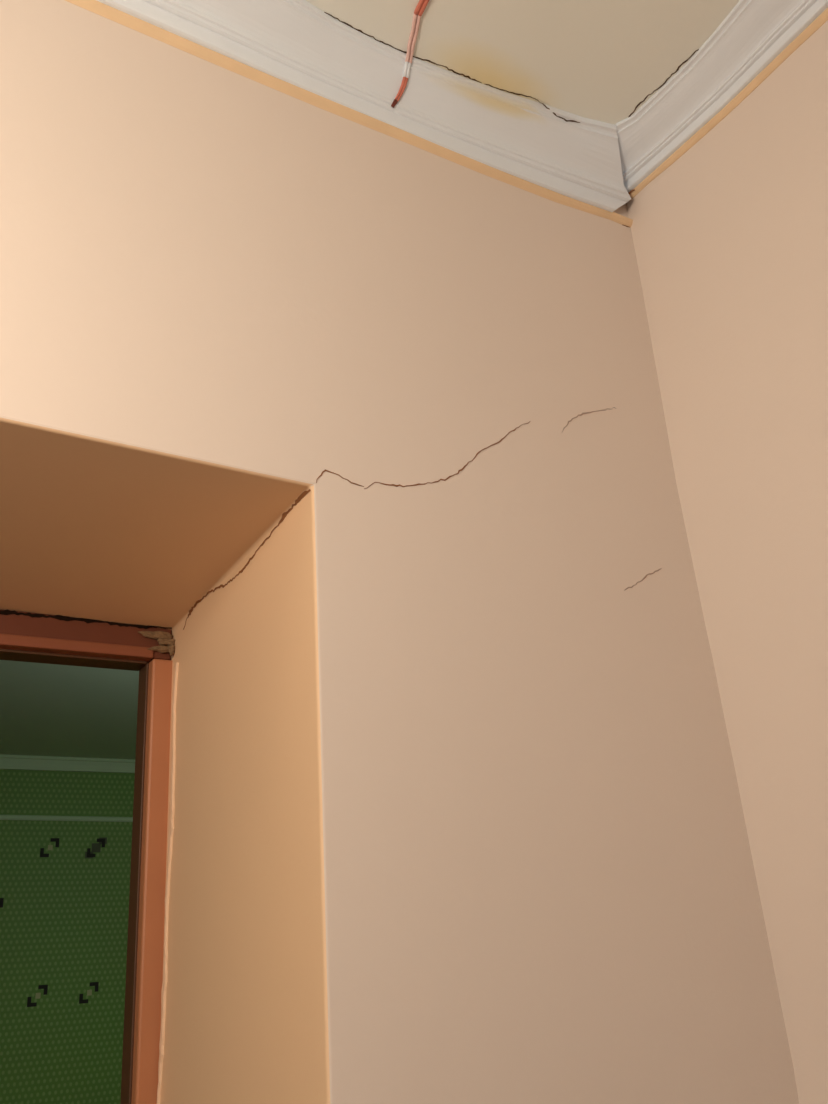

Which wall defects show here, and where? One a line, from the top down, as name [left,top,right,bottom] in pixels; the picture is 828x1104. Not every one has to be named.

crack [324,12,580,123]
crack [629,49,699,117]
crack [562,407,615,432]
crack [0,423,528,630]